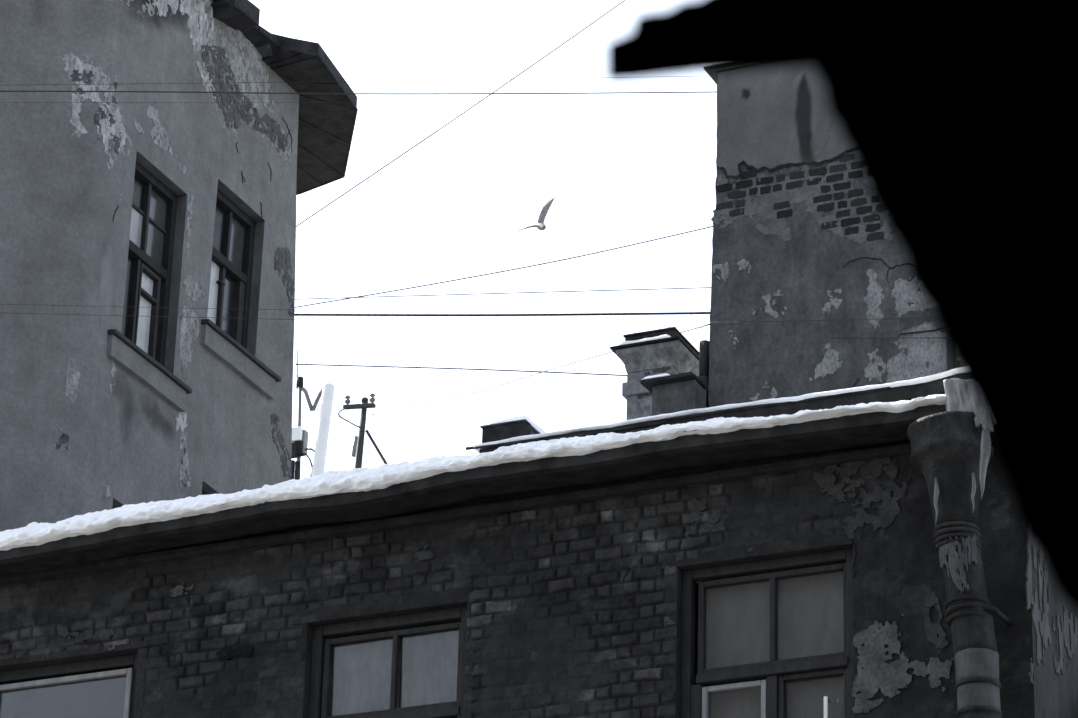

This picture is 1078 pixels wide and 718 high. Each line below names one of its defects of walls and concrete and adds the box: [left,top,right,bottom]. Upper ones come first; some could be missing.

peeling [59,41,186,175]
peeling [186,189,194,257]
spalling [121,0,293,162]
flaking render [711,152,894,244]
leakage [800,134,812,162]
peeling [809,343,843,381]
peeling [864,269,947,383]
peeling [852,592,955,713]
peeling [939,533,977,594]
peeling [1025,539,1078,684]